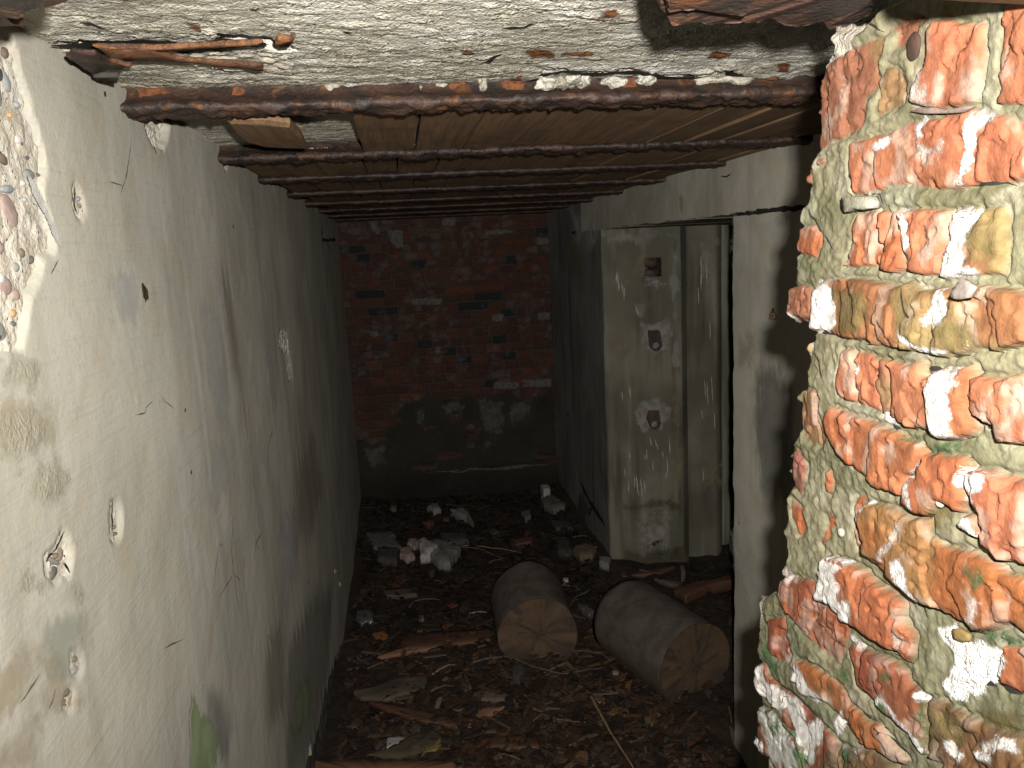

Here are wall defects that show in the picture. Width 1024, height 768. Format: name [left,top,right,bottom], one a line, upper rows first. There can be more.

rust [136,87,170,97]
rust [66,21,296,83]
rust [501,76,524,90]
spalling [0,29,60,352]
leakage [920,206,984,328]
leakage [786,279,836,334]
leakage [923,367,963,440]
spalling [43,531,70,581]
spalling [109,499,118,542]
leakage [813,556,867,651]
leakage [938,599,1005,702]
leakage [754,664,847,766]